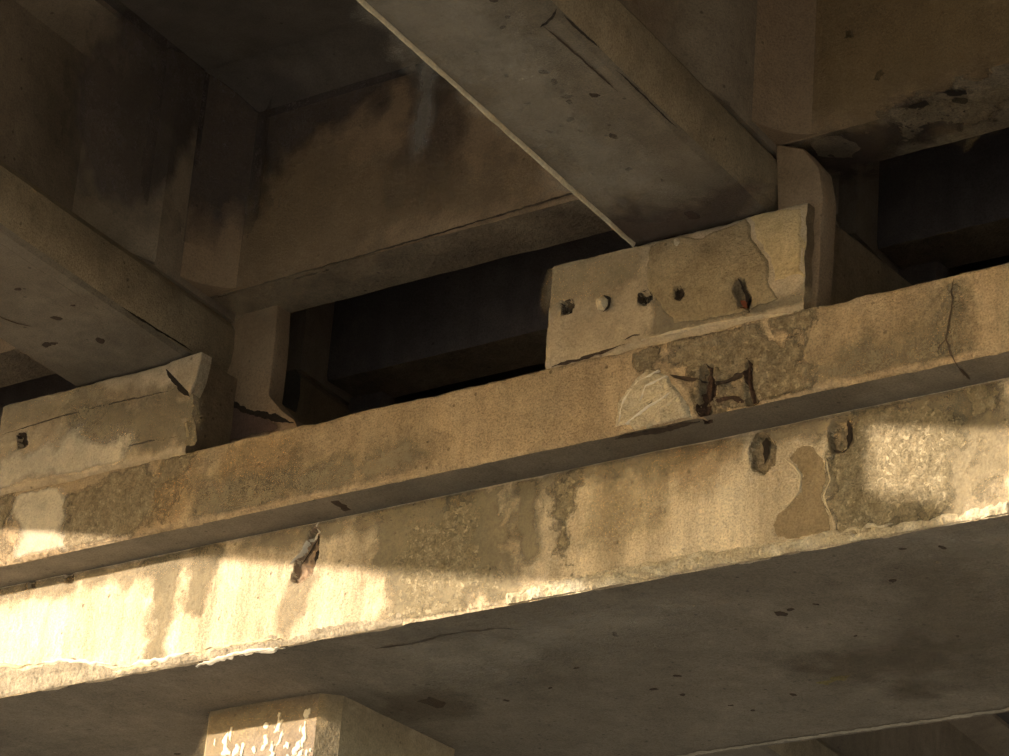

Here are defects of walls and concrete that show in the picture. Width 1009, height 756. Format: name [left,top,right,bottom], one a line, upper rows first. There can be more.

crack [540,9,675,126]
damp [362,61,462,215]
crack [8,369,190,433]
crack [234,401,293,423]
spalling [615,307,819,430]
spalling [731,278,752,312]
spalling [749,380,1001,539]
crack [938,279,970,380]
peeling [0,492,504,698]